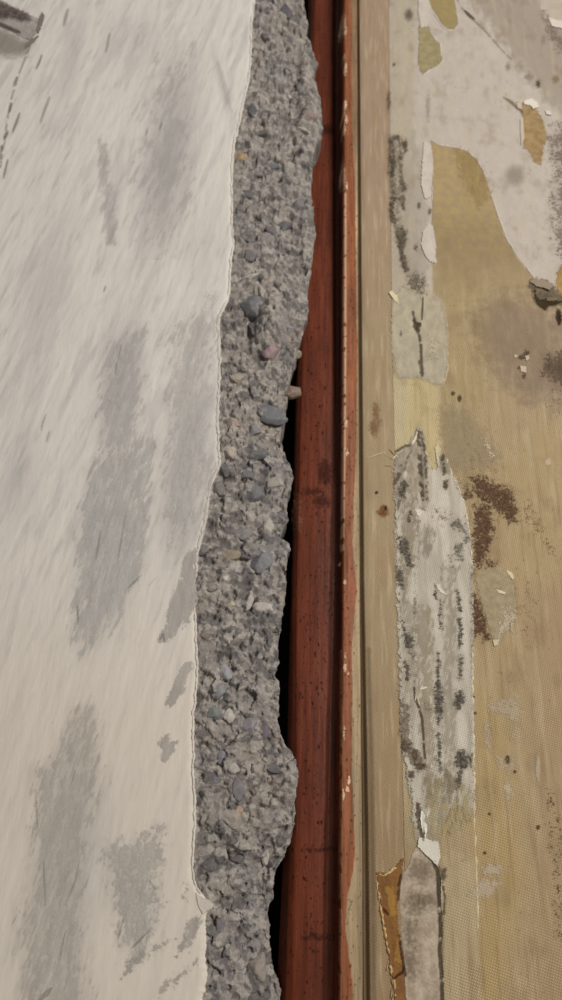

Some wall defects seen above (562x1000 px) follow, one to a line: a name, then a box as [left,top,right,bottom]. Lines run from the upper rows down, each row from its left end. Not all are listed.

peeling [418,0,459,76]
peeling [548,17,562,29]
peeling [516,98,551,165]
damp [407,270,428,295]
peeling [421,141,562,325]
peeling [389,284,448,386]
flaking render [514,350,529,378]
spalling [100,0,323,1000]
damp [424,443,555,790]
peeling [384,426,517,1000]